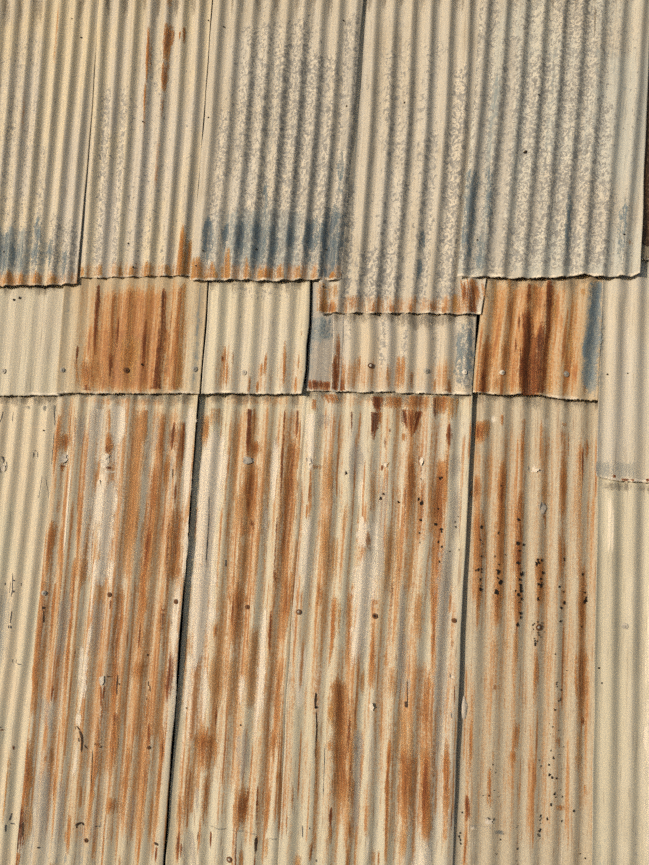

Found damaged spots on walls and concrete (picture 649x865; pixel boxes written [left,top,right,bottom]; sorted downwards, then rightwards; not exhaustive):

corrosion [160,23,185,111]
corrosion [75,226,284,393]
corrosion [476,280,556,395]
corrosion [30,445,88,714]
corrosion [105,410,185,649]
corrosion [175,408,338,865]
corrosion [371,357,458,865]
corrosion [470,462,524,620]
corrosion [535,558,545,604]
corrosion [541,423,588,537]
corrosion [16,740,33,865]
corrosion [328,677,361,845]